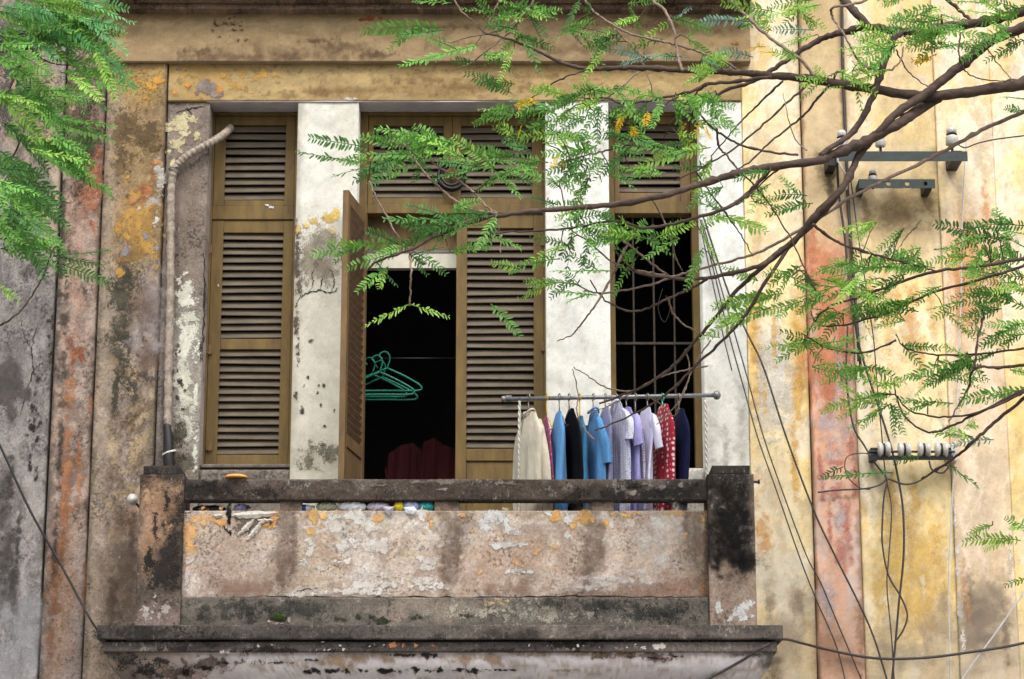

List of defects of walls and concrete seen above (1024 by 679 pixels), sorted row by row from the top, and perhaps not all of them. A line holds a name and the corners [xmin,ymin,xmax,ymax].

peeling [83,75,201,277]
peeling [296,208,340,234]
crack [295,265,337,307]
crack [20,320,42,414]
peeling [172,272,201,472]
leakage [81,478,337,679]
peeling [143,489,279,586]
peeling [300,508,400,571]
peeling [279,555,449,597]
peeling [456,507,688,591]
flaking render [150,641,516,679]
leakage [457,640,605,665]